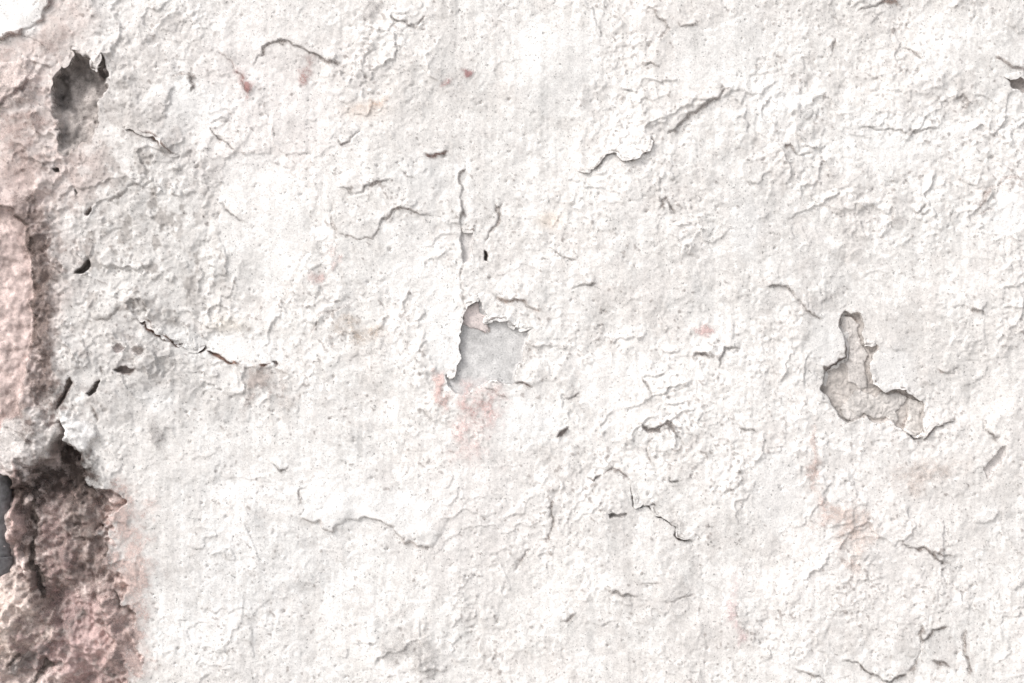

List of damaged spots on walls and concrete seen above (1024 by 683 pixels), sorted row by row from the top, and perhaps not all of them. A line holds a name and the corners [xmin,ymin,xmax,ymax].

spalling [45,42,109,157]
flaking render [0,206,35,430]
spalling [74,260,91,274]
spalling [114,366,134,375]
spalling [113,344,144,356]
crack [135,314,269,366]
flaking render [445,294,533,395]
flaking render [820,311,955,440]
flaking render [0,377,144,683]
crack [631,421,696,541]